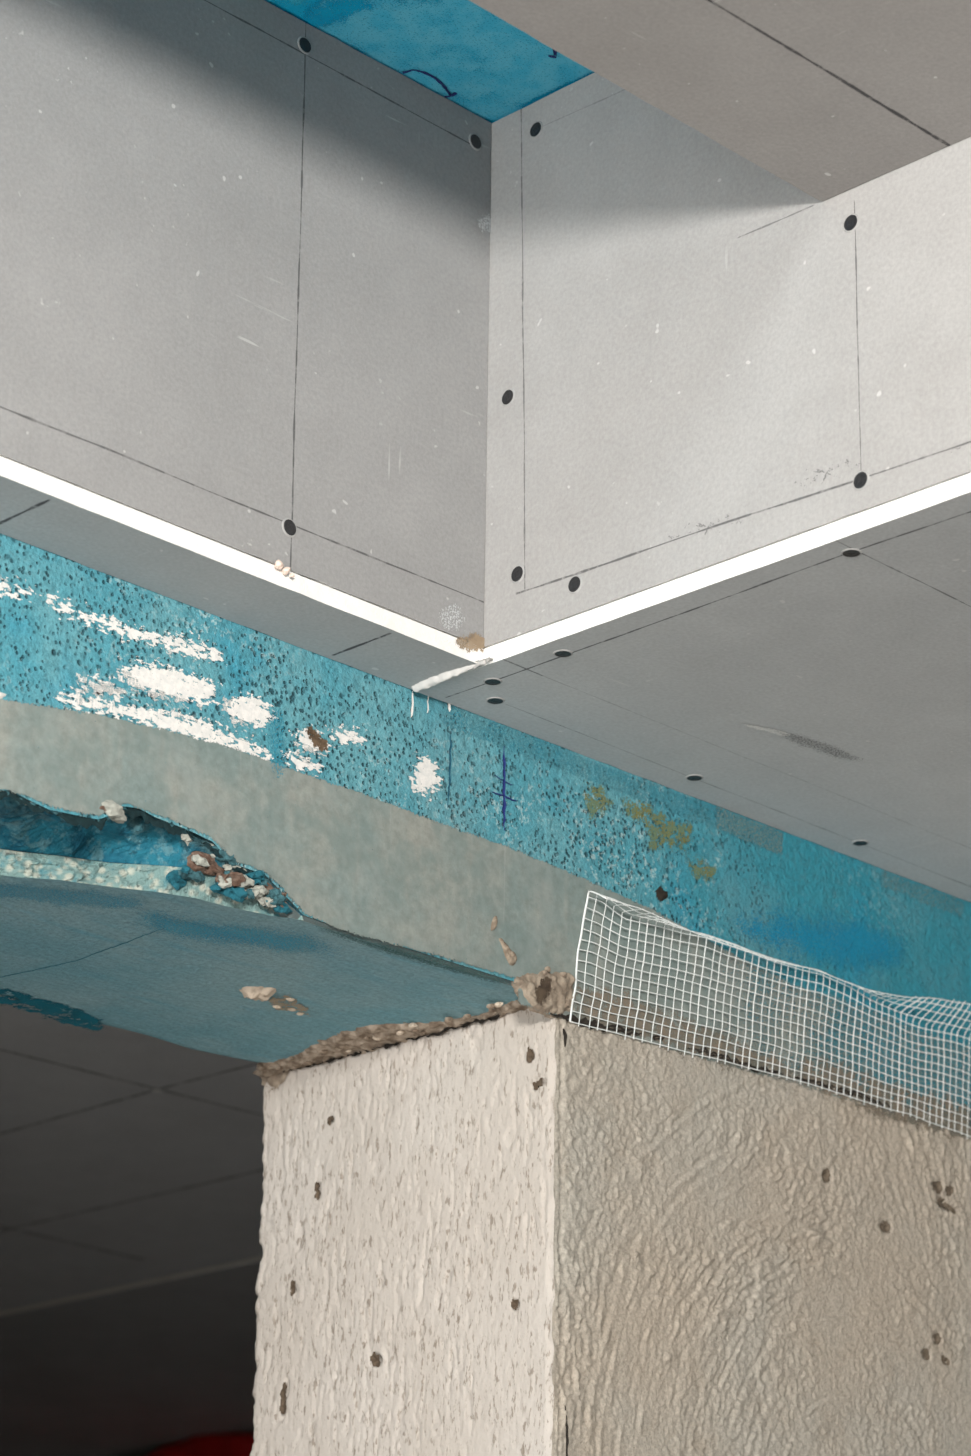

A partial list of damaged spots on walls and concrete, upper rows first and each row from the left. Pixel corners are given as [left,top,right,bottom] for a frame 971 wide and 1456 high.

spalling [0,790,303,920]
peeling [239,986,303,1016]
spalling [252,916,576,1090]